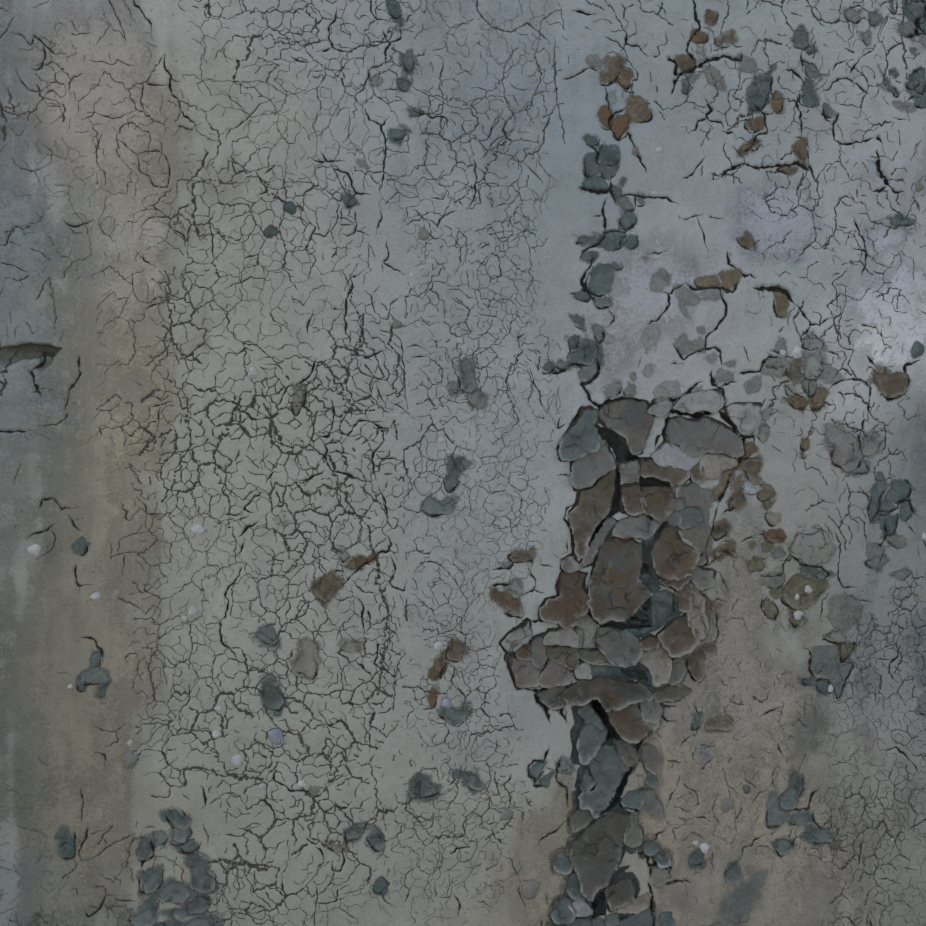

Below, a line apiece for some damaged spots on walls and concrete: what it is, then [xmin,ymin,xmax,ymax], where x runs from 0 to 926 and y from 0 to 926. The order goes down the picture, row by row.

peeling [676,9,738,95]
peeling [737,53,784,156]
peeling [878,64,926,113]
peeling [574,55,653,310]
peeling [543,314,614,379]
peeling [650,268,742,315]
crack [0,0,641,926]
peeling [420,456,471,518]
crack [570,0,926,926]
peeling [823,421,917,580]
peeling [490,325,863,926]
peeling [117,809,223,926]